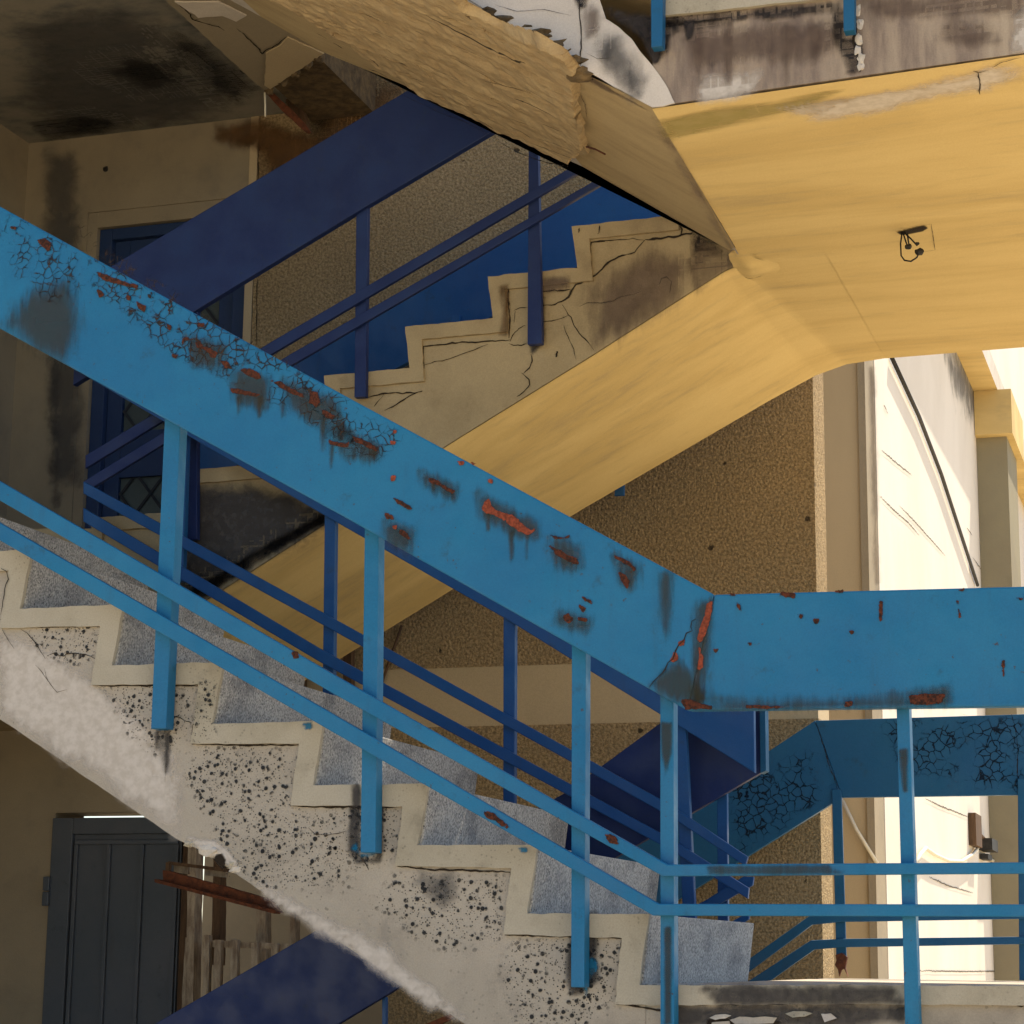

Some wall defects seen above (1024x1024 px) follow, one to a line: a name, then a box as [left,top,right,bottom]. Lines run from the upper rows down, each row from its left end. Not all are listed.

leakage [613,3,862,73]
leakage [786,69,1009,118]
leakage [48,158,76,245]
crack [423,226,693,396]
corrosion [172,337,378,460]
corrosion [482,499,579,569]
crack [649,619,695,688]
corrosion [657,601,719,710]
corrosion [891,688,946,705]
leakage [0,627,456,1015]
crack [733,723,837,851]
crack [889,717,1022,790]